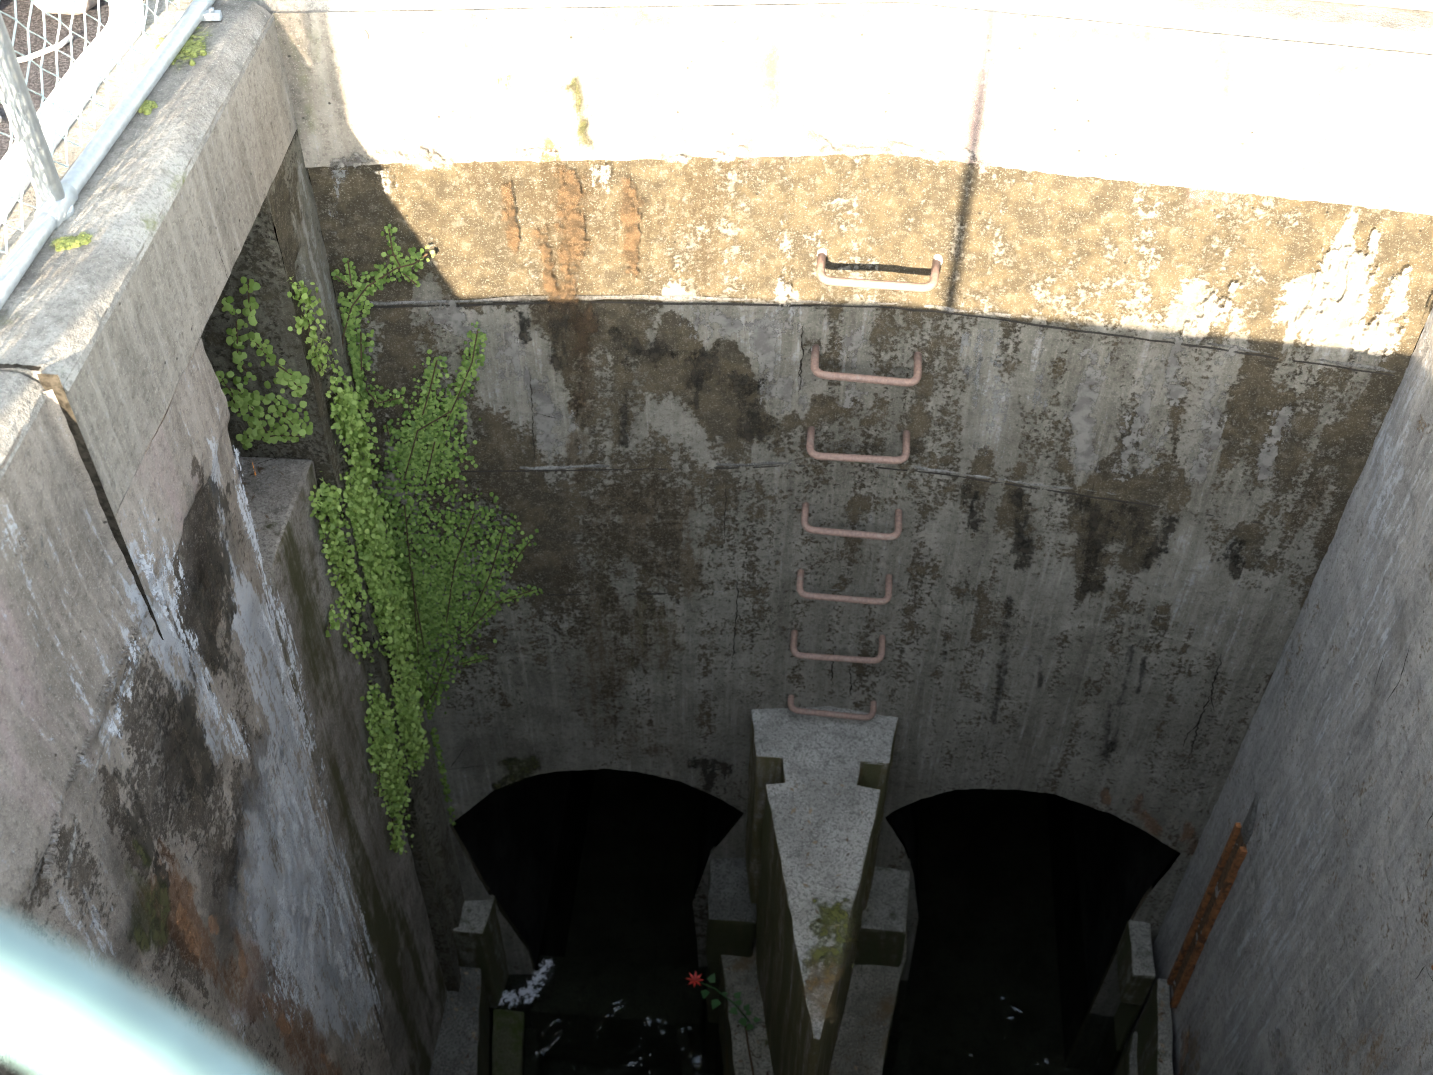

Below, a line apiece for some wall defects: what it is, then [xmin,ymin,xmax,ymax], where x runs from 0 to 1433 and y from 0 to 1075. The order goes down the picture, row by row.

water stain [329,170,349,217]
water stain [590,165,610,192]
water stain [518,311,532,344]
water stain [549,305,779,450]
crack [0,363,164,640]
water stain [961,484,984,532]
water stain [1007,488,1034,572]
water stain [1065,485,1179,597]
water stain [1214,539,1246,580]
water stain [108,637,141,739]
water stain [134,445,385,1040]
water stain [111,769,171,951]